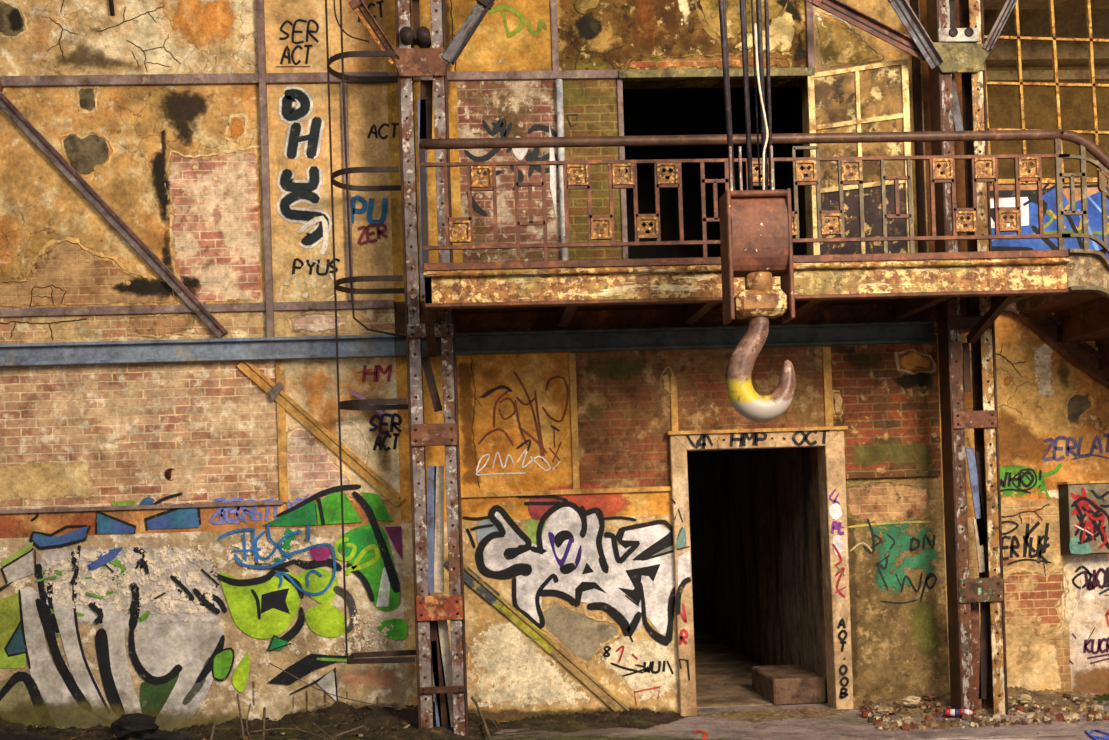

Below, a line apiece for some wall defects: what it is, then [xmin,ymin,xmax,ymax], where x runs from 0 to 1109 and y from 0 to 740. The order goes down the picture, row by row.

damp [8,10,23,31]
crack [47,0,181,70]
damp [576,14,602,39]
spalling [625,0,792,70]
damp [113,91,210,297]
spalling [0,113,351,340]
crack [996,344,1026,378]
spalling [1003,555,1083,645]